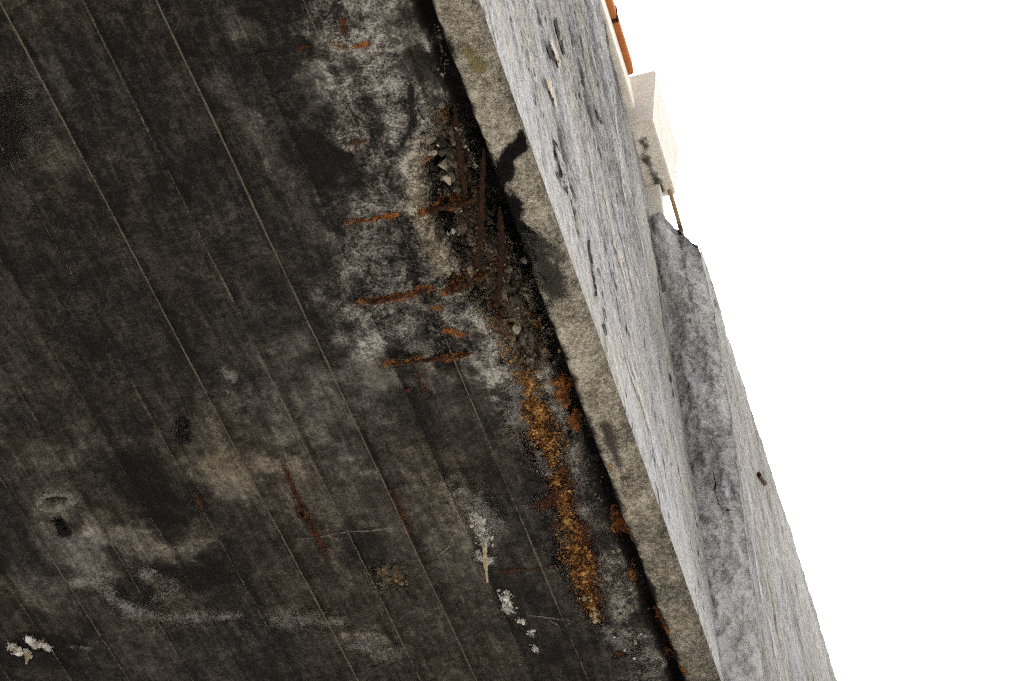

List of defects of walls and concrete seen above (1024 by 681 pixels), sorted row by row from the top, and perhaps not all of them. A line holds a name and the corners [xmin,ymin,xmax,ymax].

spalling [434,24,449,79]
corrosion [357,259,495,310]
spalling [365,103,561,434]
leakage [521,230,571,307]
spalling [531,426,570,491]
corrosion [520,371,605,614]
leakage [455,486,504,565]
leakage [7,634,54,659]
leakage [497,589,542,653]